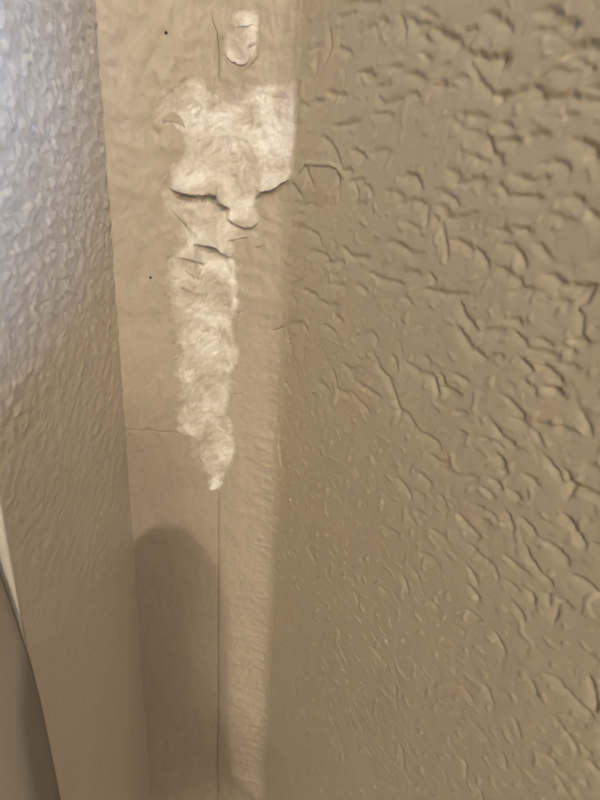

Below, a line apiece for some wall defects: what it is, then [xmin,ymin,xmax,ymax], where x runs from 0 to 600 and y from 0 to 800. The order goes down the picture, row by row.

flaking render [221,7,261,71]
flaking render [150,68,298,493]